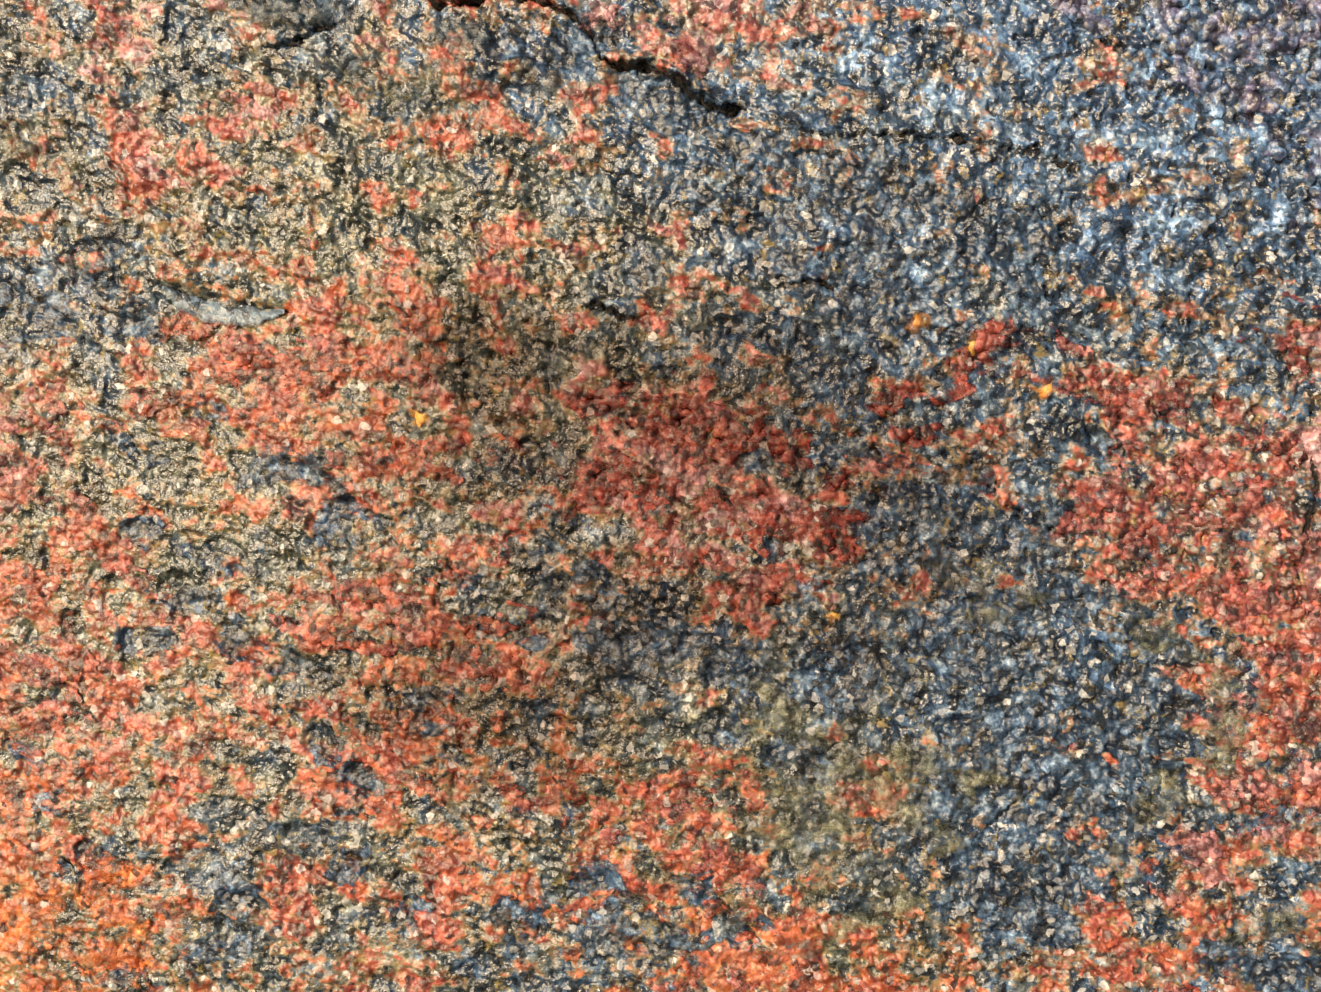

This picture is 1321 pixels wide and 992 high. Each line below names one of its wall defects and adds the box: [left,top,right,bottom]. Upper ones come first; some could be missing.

crack [429,0,485,12]
crack [288,25,335,47]
crack [518,0,747,116]
crack [790,126,922,143]
crack [953,136,966,145]
crack [1014,145,1097,168]